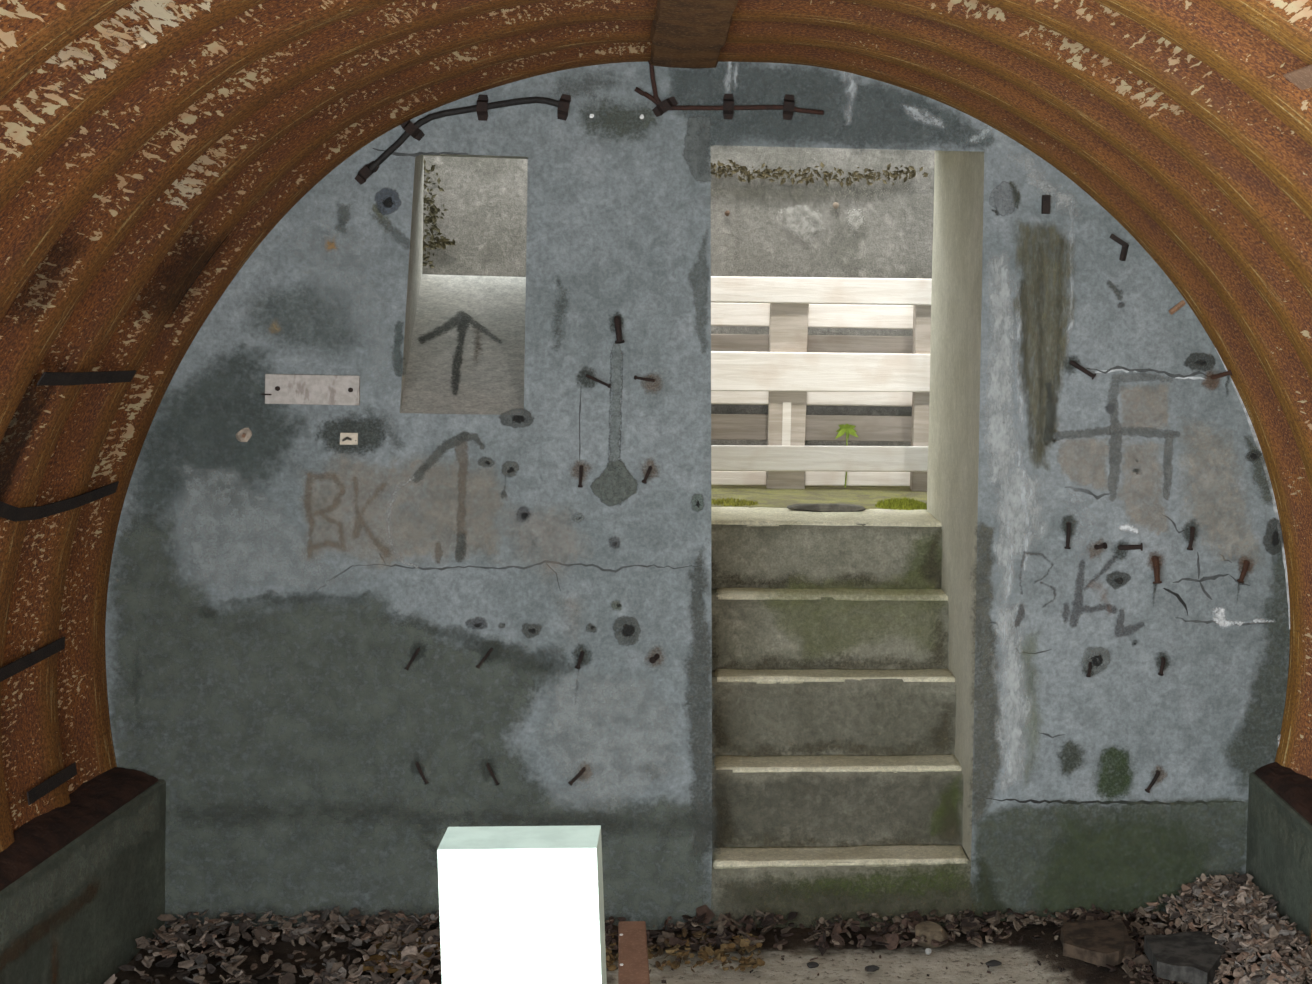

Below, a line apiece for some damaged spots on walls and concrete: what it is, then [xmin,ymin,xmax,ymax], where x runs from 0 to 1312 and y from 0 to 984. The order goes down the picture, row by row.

peeling [41,0,212,94]
peeling [157,154,226,211]
damp [336,206,350,232]
spalling [373,188,401,222]
damp [375,217,410,248]
crack [1086,366,1209,380]
damp [0,225,1312,946]
crack [1163,515,1272,626]